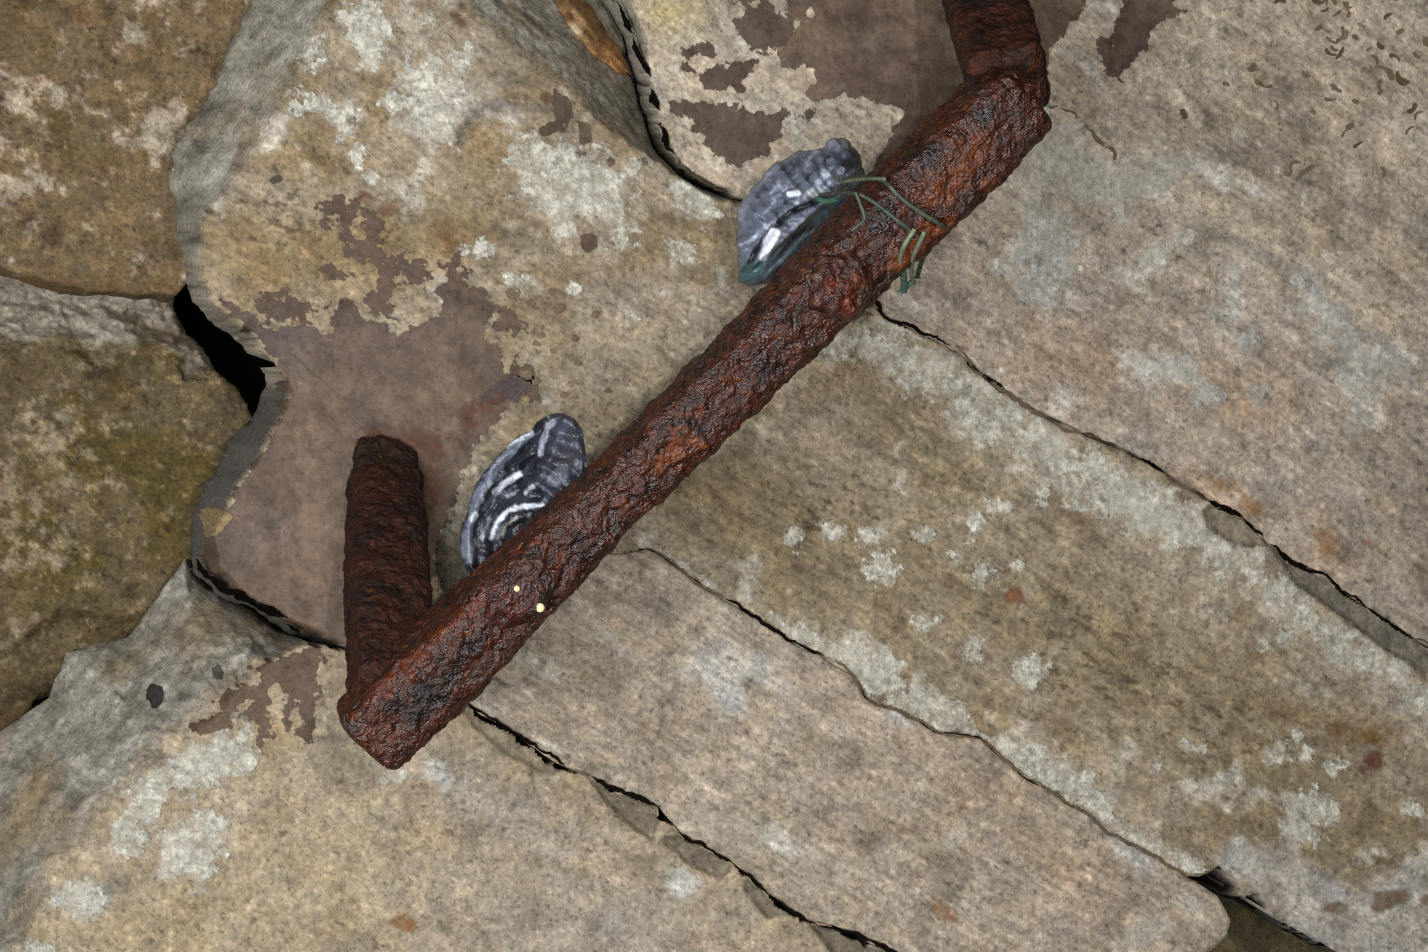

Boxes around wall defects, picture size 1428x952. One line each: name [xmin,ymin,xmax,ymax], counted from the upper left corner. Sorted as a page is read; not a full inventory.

water stain [502,89,648,254]
water stain [664,174,725,267]
water stain [667,0,964,171]
water stain [994,0,1208,308]
crack [852,300,1428,644]
crack [468,703,897,952]
crack [658,553,1197,882]